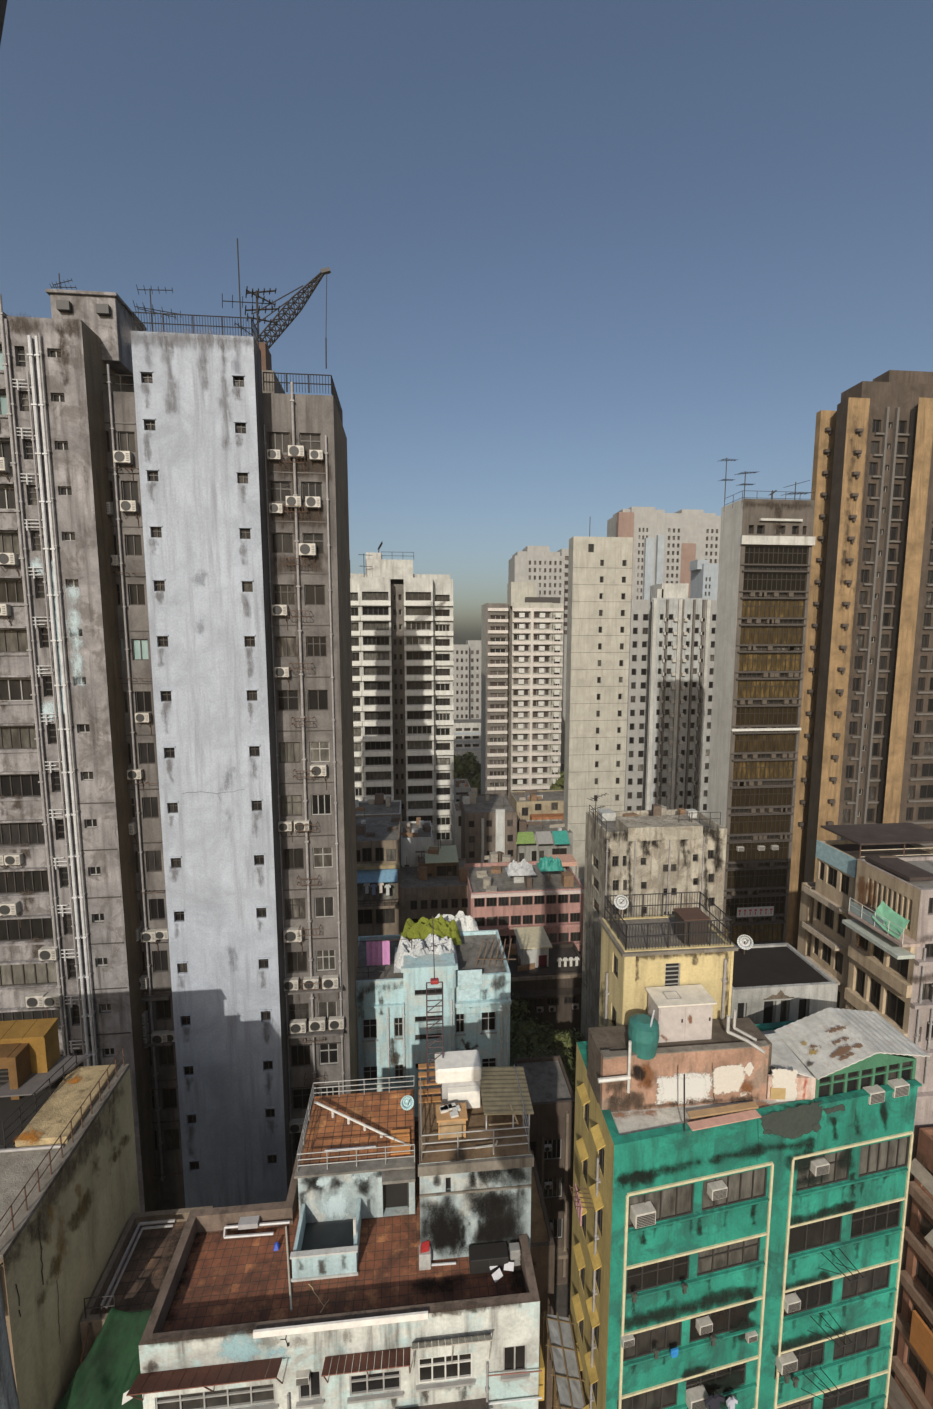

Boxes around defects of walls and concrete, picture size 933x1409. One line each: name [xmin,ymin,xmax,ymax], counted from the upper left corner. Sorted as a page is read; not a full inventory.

peeling [655,1062,754,1105]
flaking render [760,1069,845,1139]
damp [880,1103,888,1126]
damp [419,1149,525,1255]
damp [617,1172,653,1186]
damp [797,1127,863,1212]
damp [730,1294,757,1346]